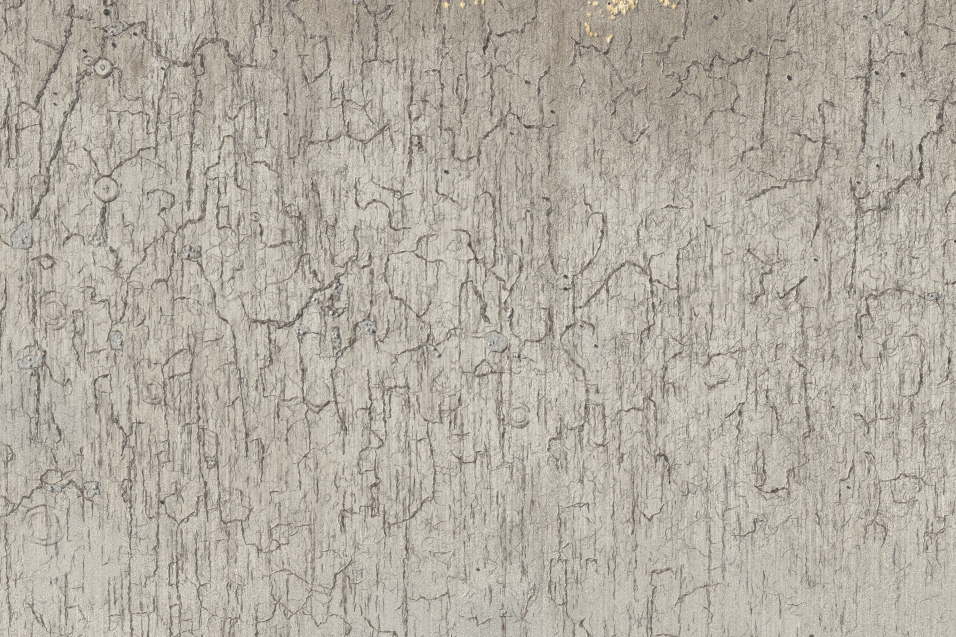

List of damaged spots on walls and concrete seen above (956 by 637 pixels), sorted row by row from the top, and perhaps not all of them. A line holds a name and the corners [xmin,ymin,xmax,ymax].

crack [162,0,179,25]
crack [834,22,863,44]
crack [682,402,709,423]
crack [478,532,497,576]
crack [458,585,494,635]
crack [603,614,622,637]
crack [739,569,804,637]
crack [778,541,860,637]